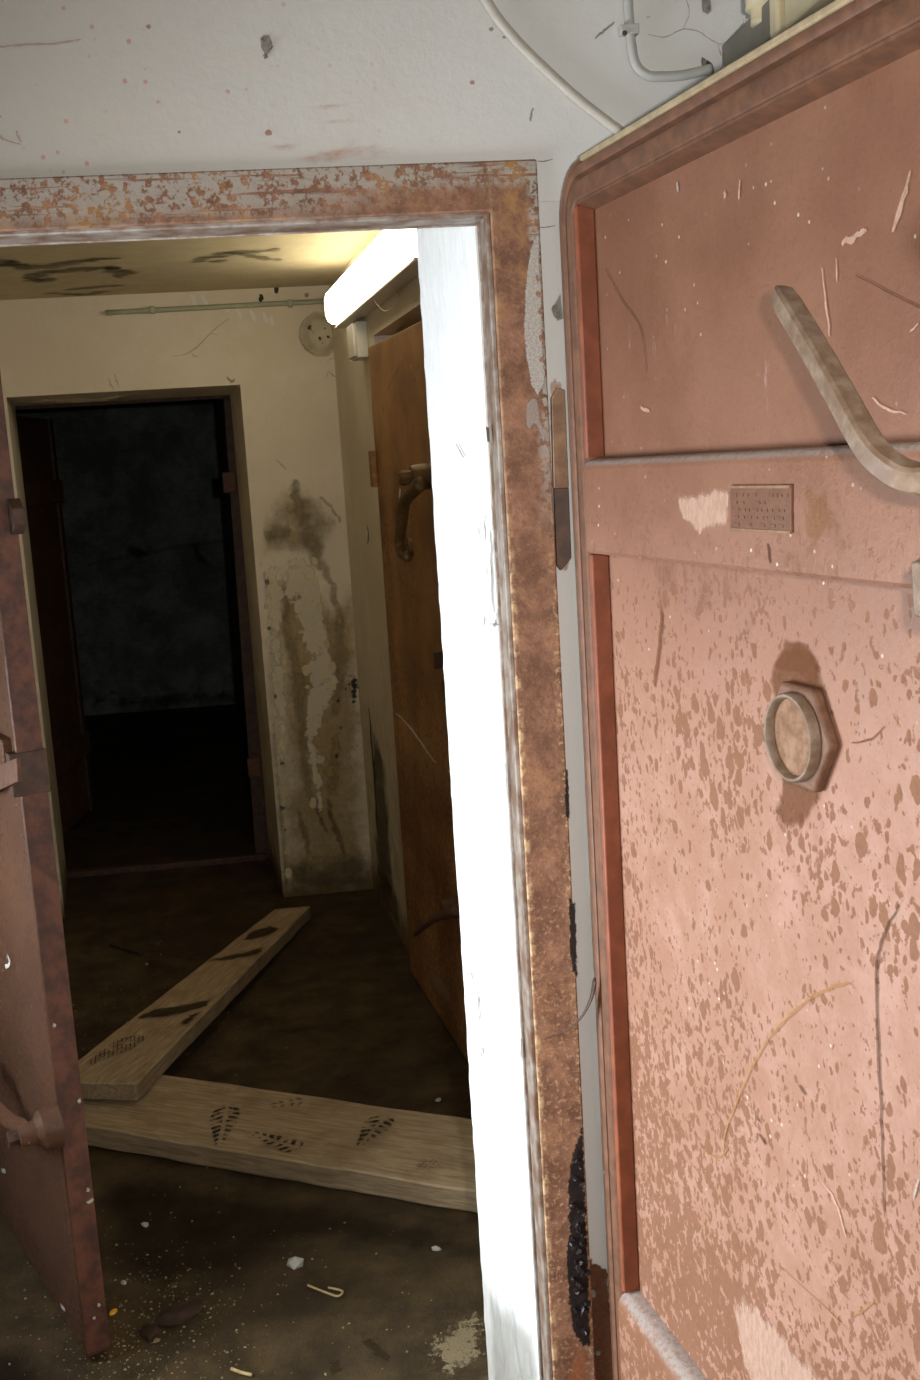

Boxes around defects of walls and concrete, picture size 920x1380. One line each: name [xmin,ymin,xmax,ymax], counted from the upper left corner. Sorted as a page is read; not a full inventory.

damp [281,587,398,920]
rust [568,898,578,976]